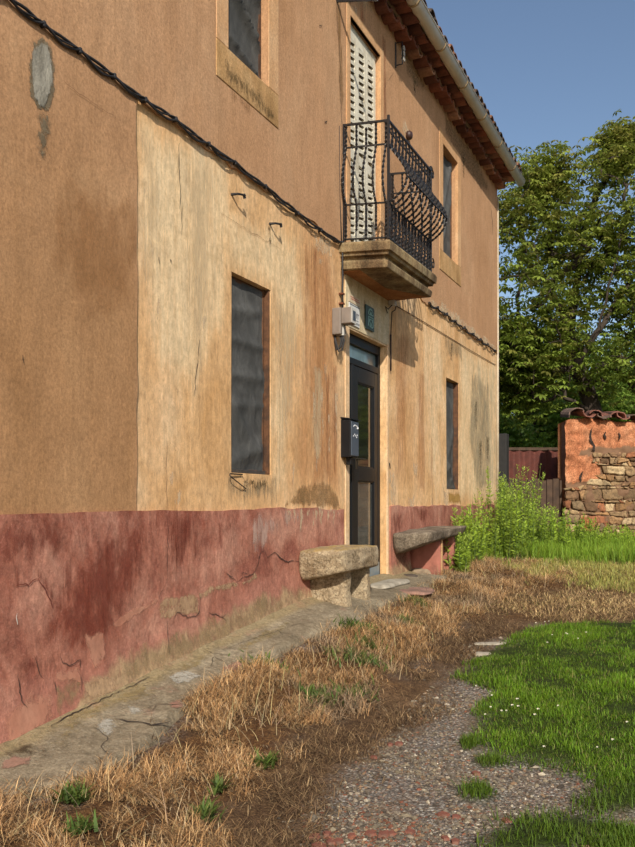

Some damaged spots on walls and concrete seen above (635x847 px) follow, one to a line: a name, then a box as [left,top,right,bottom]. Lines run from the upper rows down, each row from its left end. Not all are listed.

spalling [29,37,55,158]
water stain [287,483,339,510]
crack [228,550,299,582]
crack [16,573,53,608]
spalling [114,573,257,627]